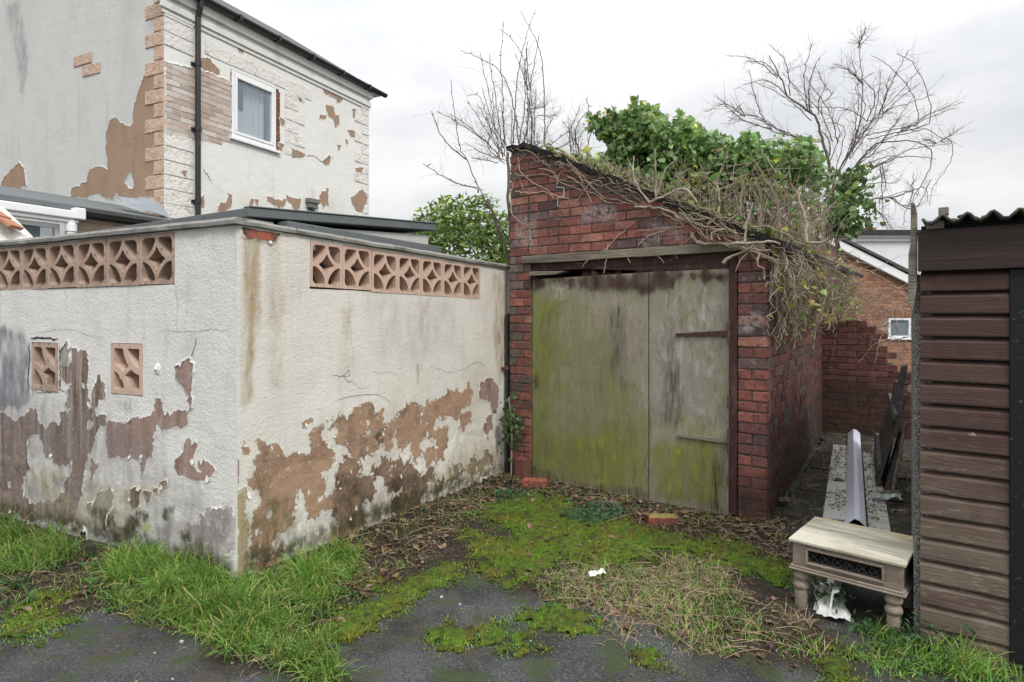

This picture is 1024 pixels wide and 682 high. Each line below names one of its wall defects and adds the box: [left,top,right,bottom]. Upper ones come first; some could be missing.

flaking render [1,160,28,189]
flaking render [70,56,234,202]
flaking render [238,225,283,245]
peeling [248,194,301,210]
peeling [318,88,357,166]
peeling [350,189,368,213]
water stain [0,327,29,411]
water stain [246,251,258,361]
crack [333,300,397,403]
water stain [657,284,721,419]
peeling [0,338,219,540]
peeling [180,375,500,578]